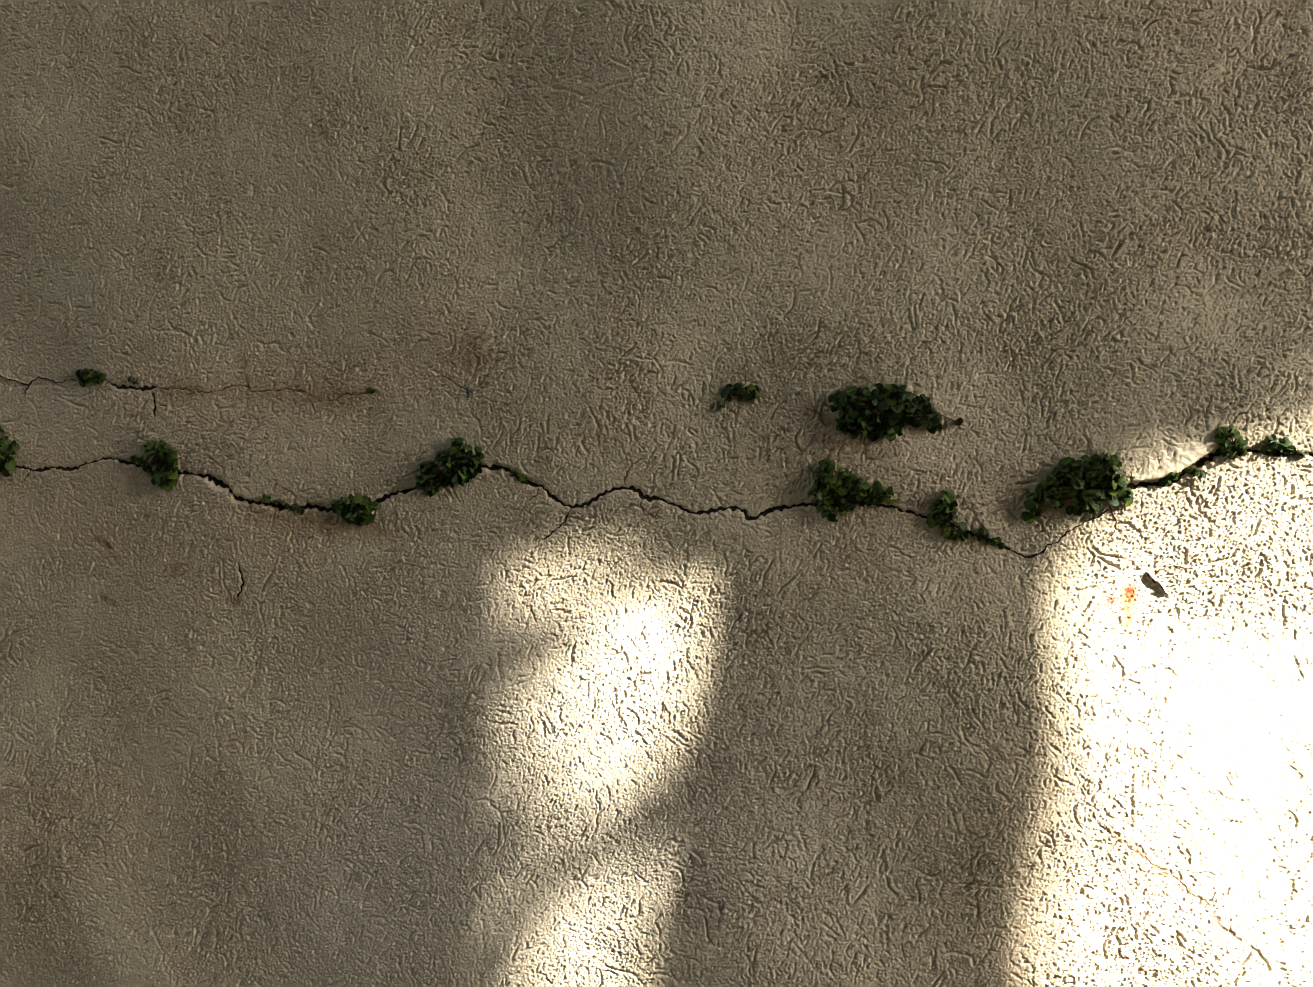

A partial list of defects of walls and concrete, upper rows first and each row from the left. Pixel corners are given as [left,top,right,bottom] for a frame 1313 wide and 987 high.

crack [0,374,74,396]
crack [106,352,367,416]
crack [16,457,346,514]
crack [375,477,446,504]
crack [480,458,818,540]
crack [854,447,1313,559]
corrosion [1125,586,1135,620]